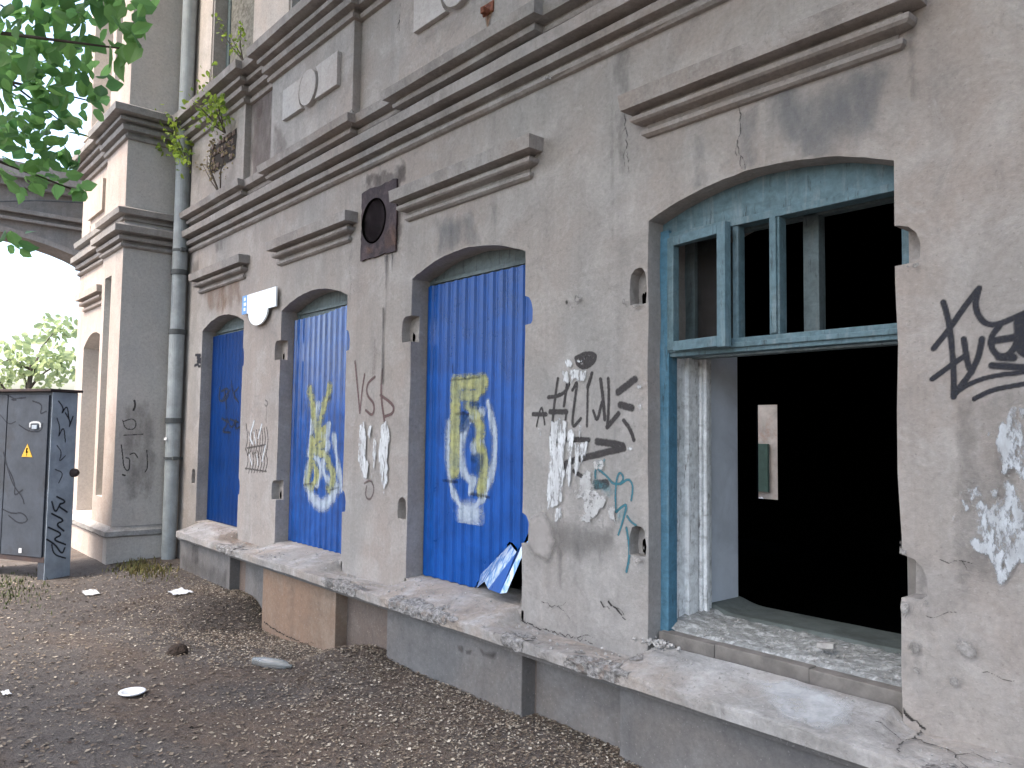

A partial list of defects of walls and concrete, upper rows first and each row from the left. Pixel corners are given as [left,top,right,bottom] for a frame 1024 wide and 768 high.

peeling [575,460,615,523]
peeling [962,407,1024,584]
spalling [388,595,458,625]
spalling [564,650,643,684]
crack [876,708,1011,768]